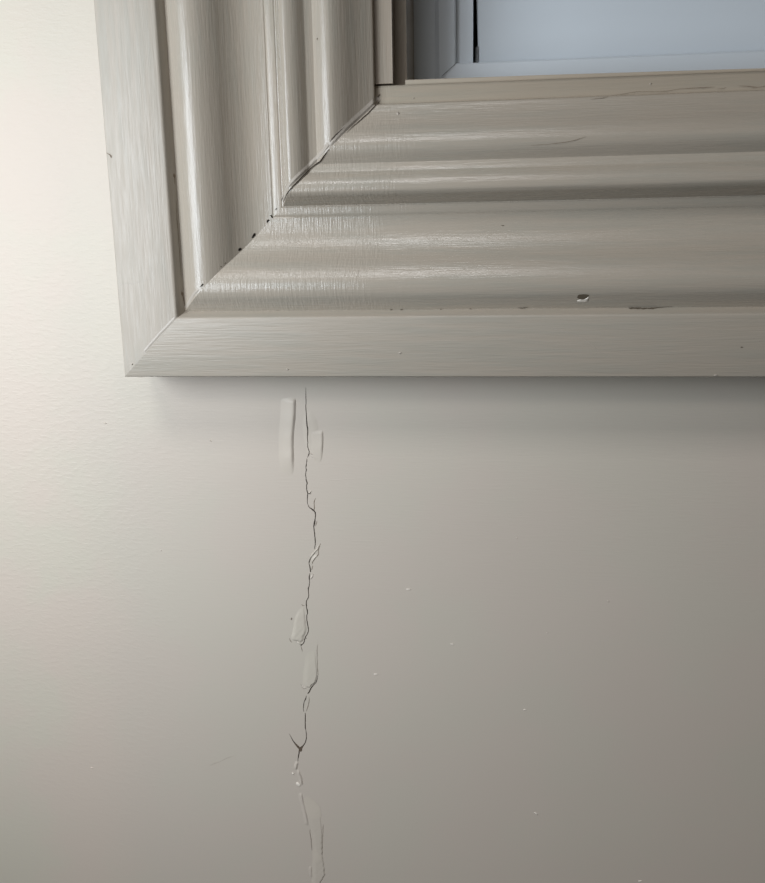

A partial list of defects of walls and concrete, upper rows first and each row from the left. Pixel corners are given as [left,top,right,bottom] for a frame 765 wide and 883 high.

crack [289,397,320,649]
crack [291,663,323,878]